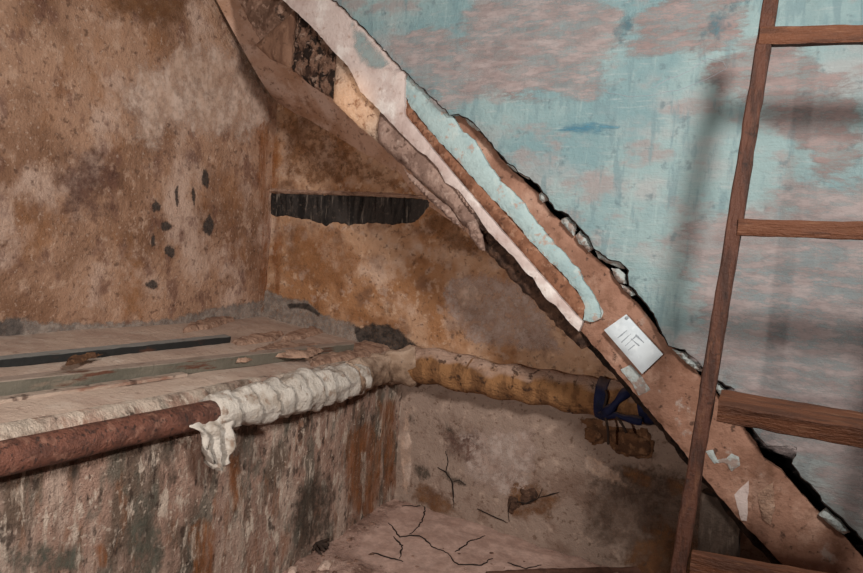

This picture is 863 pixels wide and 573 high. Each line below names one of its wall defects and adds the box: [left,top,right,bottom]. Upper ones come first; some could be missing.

peeling [744,47,863,222]
spalling [459,114,728,372]
peeling [716,236,863,412]
peeling [621,364,650,395]
crack [438,451,464,502]
spalling [507,488,538,514]
spalling [578,418,655,459]
peeling [706,450,740,471]
peeling [734,481,749,521]
peeling [752,428,863,541]
crack [372,490,559,569]
leakage [8,546,76,573]